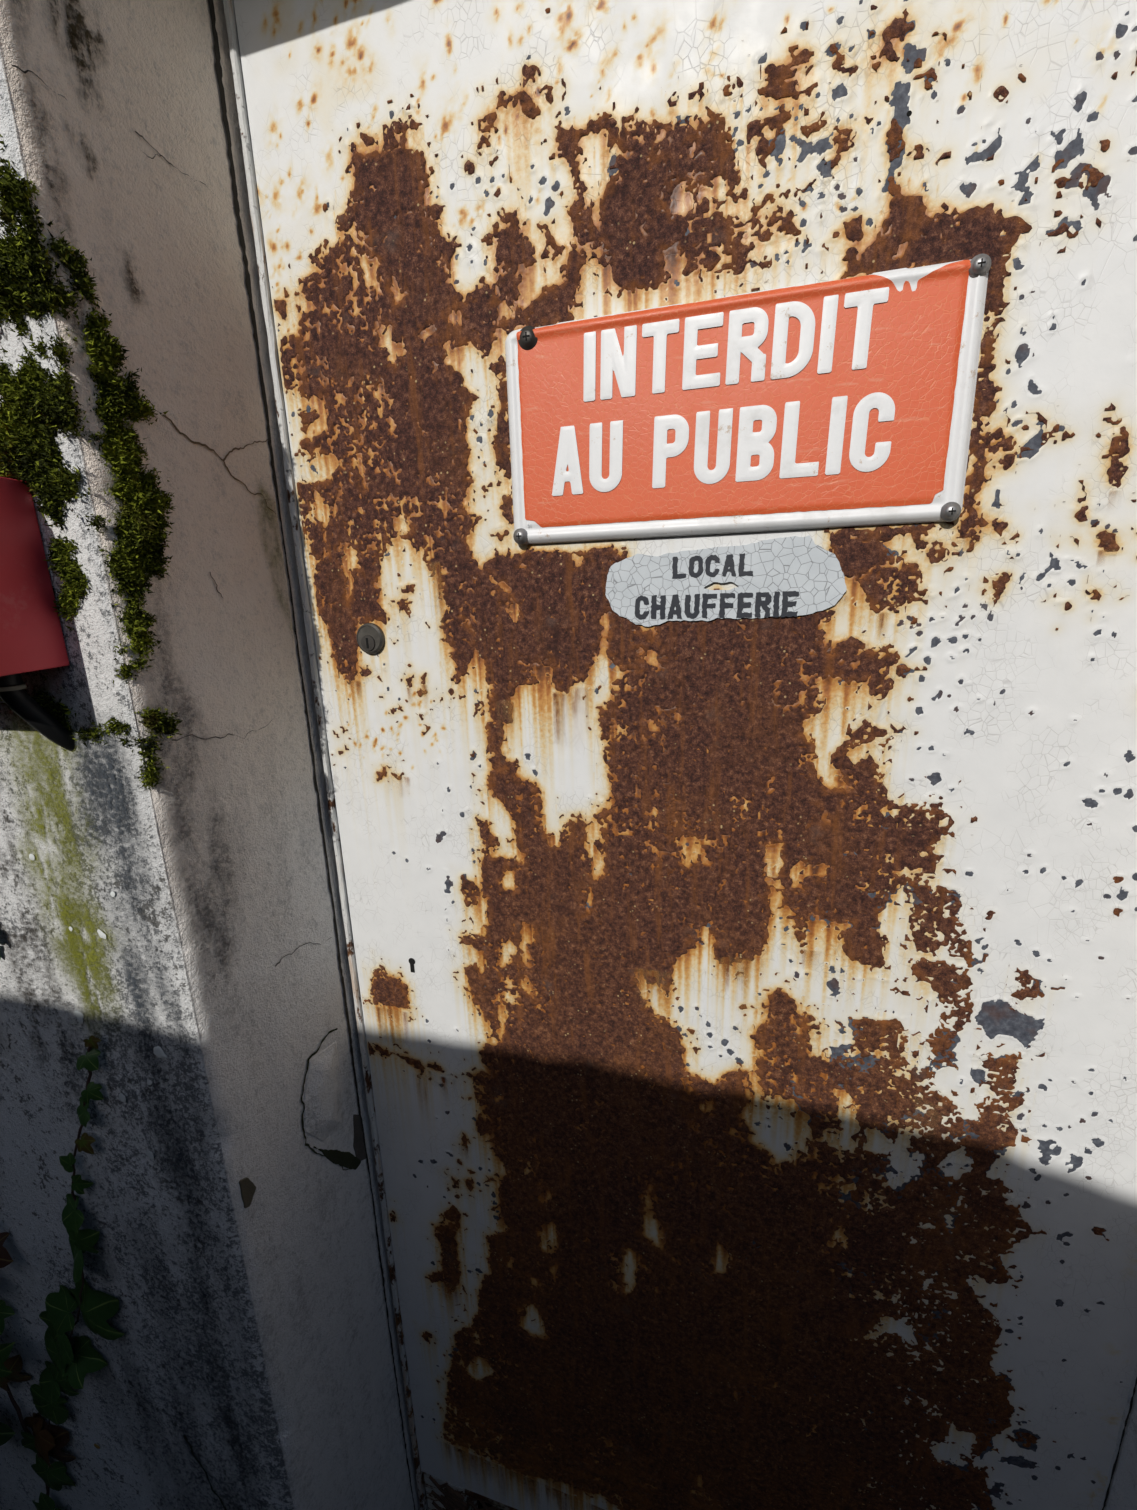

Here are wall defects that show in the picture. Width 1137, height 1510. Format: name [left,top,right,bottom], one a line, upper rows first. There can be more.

water stain [50,0,103,95]
rust [757,45,818,100]
spalling [661,0,1003,297]
spalling [957,65,1026,114]
spalling [998,91,1112,300]
spalling [1096,11,1137,78]
rust [280,106,1047,1510]
water stain [2,705,169,1077]
water stain [184,815,234,962]
spalling [648,901,1079,1109]
spalling [1011,1068,1113,1209]
crack [1102,1377,1137,1510]